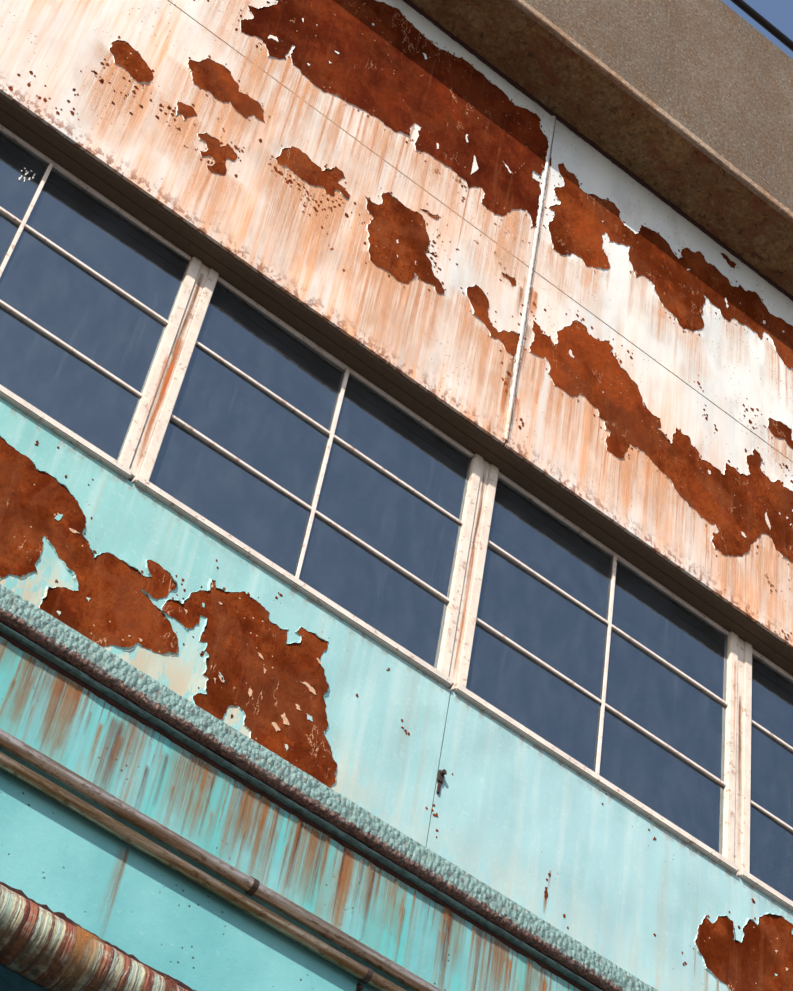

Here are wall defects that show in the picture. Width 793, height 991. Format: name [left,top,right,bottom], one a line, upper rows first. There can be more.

rust [17,71,79,120]
rust [80,0,793,602]
rust [0,435,338,788]
rust [260,797,329,868]
rust [338,848,381,903]
rust [76,926,99,962]
rust [472,926,513,987]